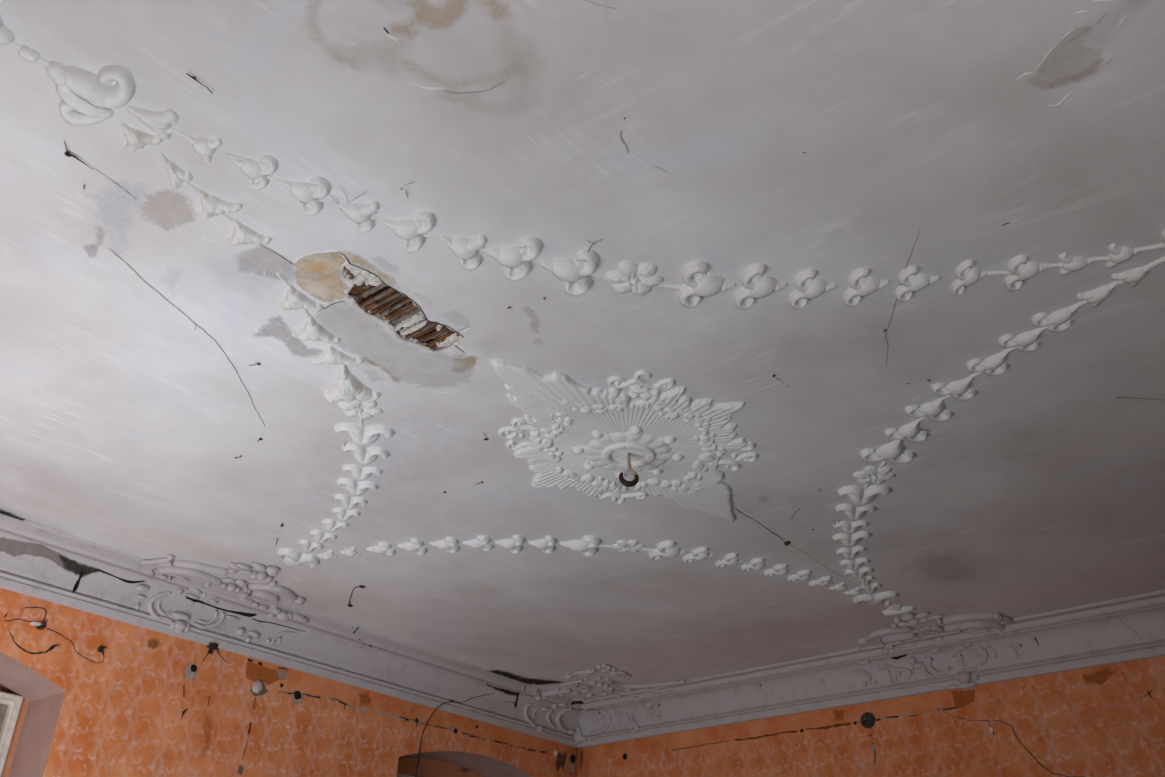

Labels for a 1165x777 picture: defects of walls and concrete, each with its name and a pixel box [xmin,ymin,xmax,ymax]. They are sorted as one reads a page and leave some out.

flaking render [260,231,475,372]
crack [73,570,145,593]
crack [185,596,306,632]
crack [947,713,1084,777]